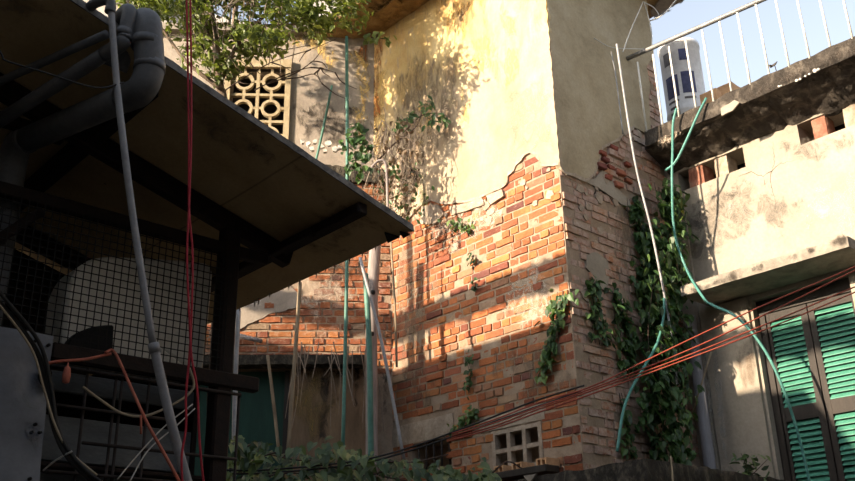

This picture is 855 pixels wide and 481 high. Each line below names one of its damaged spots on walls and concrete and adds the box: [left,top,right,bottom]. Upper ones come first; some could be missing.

spalling [650,0,684,18]
leakage [297,103,365,143]
leakage [398,54,458,203]
spalling [575,144,633,193]
peeling [420,189,506,251]